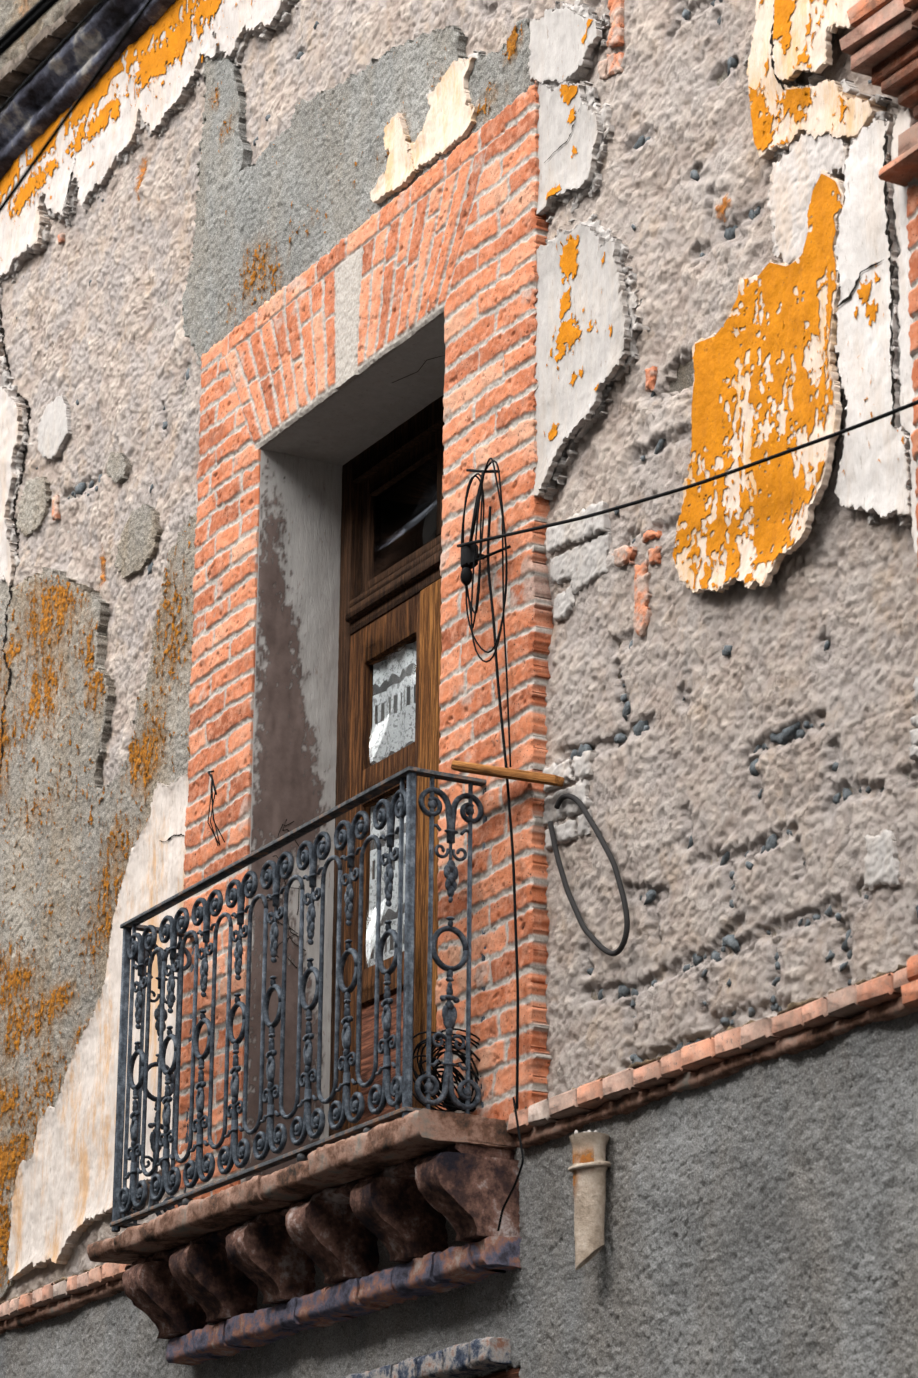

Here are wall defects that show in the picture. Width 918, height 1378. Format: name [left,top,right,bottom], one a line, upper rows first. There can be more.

crack [0,293,31,773]
spalling [0,0,918,1099]
flaking render [0,741,191,1303]